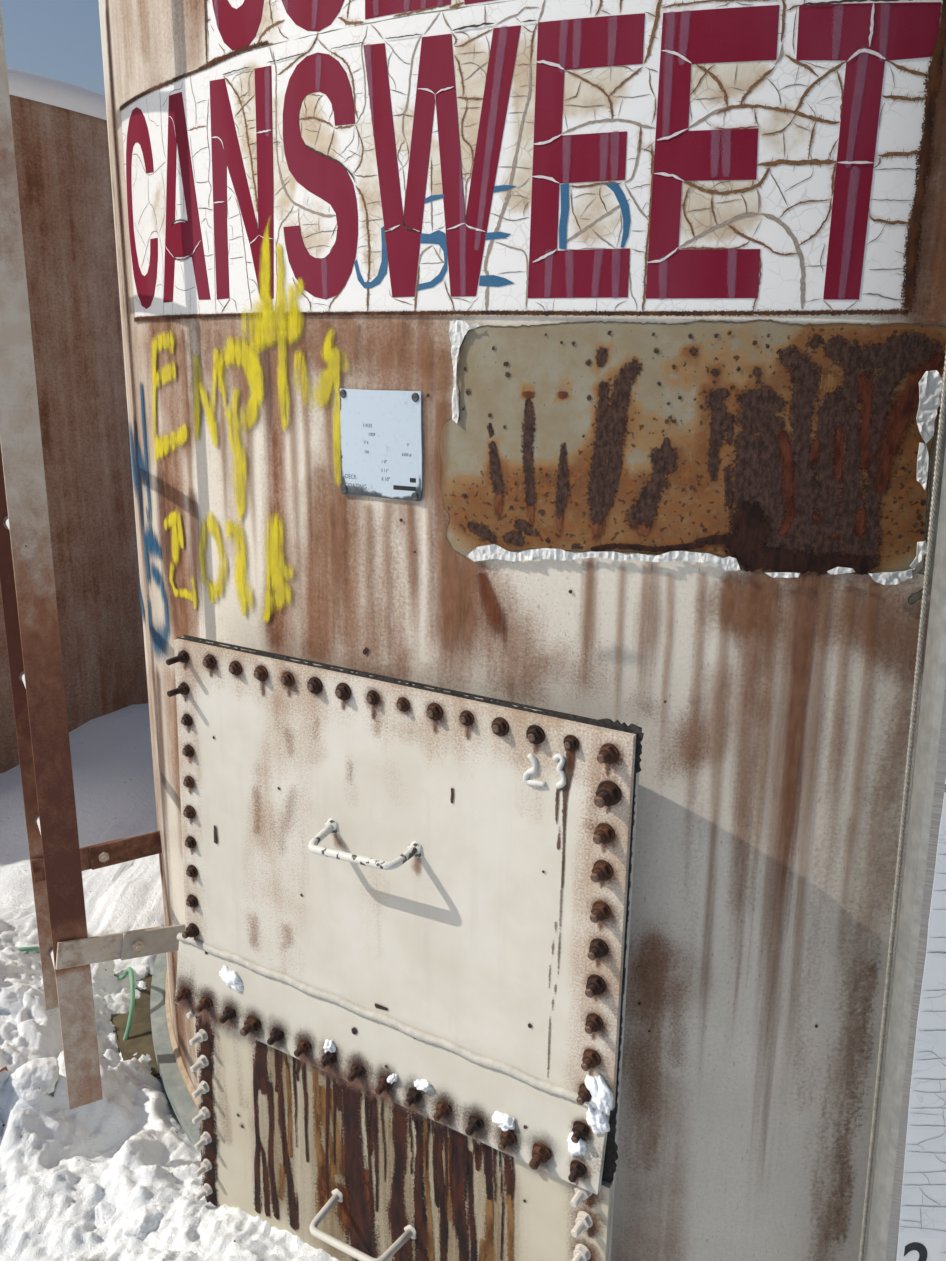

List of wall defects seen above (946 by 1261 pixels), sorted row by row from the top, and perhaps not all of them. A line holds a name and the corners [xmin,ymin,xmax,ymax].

crack [124,0,928,316]
peeling [439,319,946,604]
corrosion [155,658,193,814]
corrosion [547,743,580,1077]
corrosion [725,572,768,885]
corrosion [768,574,821,1011]
corrosion [898,608,929,664]
crack [927,854,946,954]
corrosion [172,951,236,1207]
corrosion [249,1013,517,1261]
crack [900,989,946,1253]